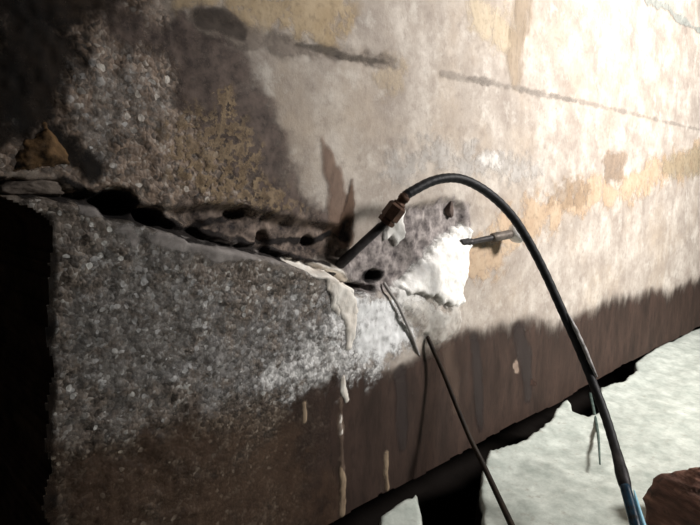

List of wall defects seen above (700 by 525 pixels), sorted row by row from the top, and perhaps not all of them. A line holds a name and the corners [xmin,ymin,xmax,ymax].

damp [0,0,330,250]
crack [18,176,98,206]
crack [119,207,332,267]
efflorescence [384,211,406,246]
damp [165,225,588,525]
damp [573,279,700,380]